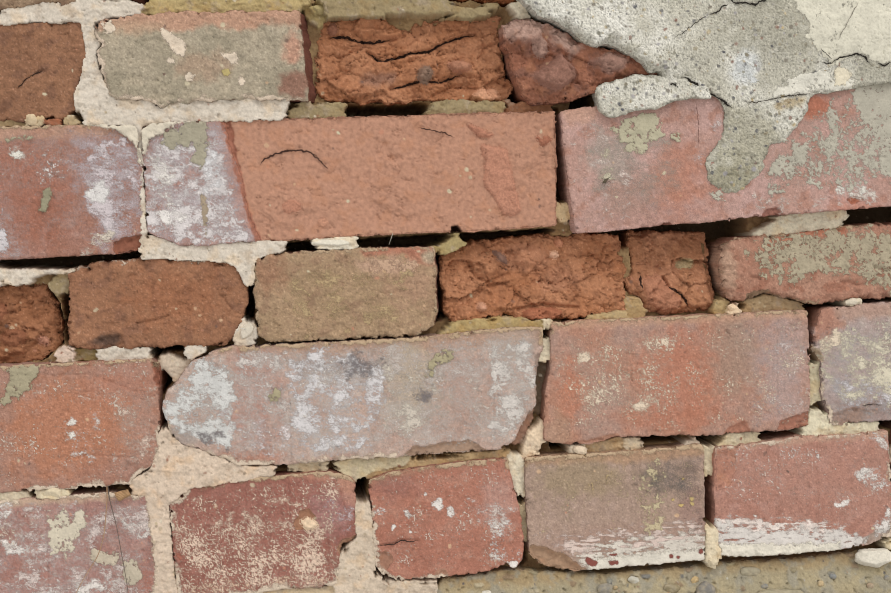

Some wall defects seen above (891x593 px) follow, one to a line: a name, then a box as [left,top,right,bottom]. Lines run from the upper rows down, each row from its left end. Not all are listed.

crack [677,0,766,36]
crack [821,6,890,66]
water stain [9,124,253,256]
spalling [225,0,891,322]
water stain [0,209,18,254]
spalling [0,284,62,363]
water stain [99,337,536,459]
water stain [65,418,94,470]
water stain [0,500,150,593]